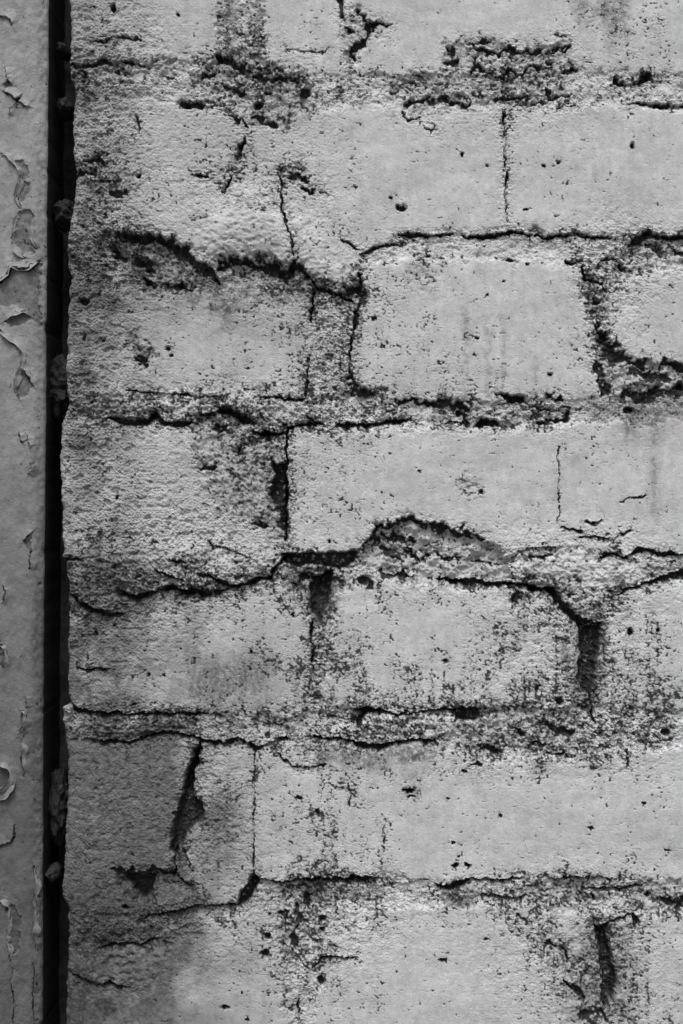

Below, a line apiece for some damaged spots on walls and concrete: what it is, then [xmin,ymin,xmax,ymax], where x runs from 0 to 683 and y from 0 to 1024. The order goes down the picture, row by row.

peeling [1,62,16,88]
peeling [0,149,44,402]
crack [191,136,247,193]
crack [279,166,356,375]
crack [340,111,613,291]
spalling [382,31,580,135]
crack [71,357,411,621]
spalling [191,405,554,628]
crack [437,445,683,628]
peeling [0,693,30,801]
crack [69,701,456,886]
peeling [0,862,62,965]